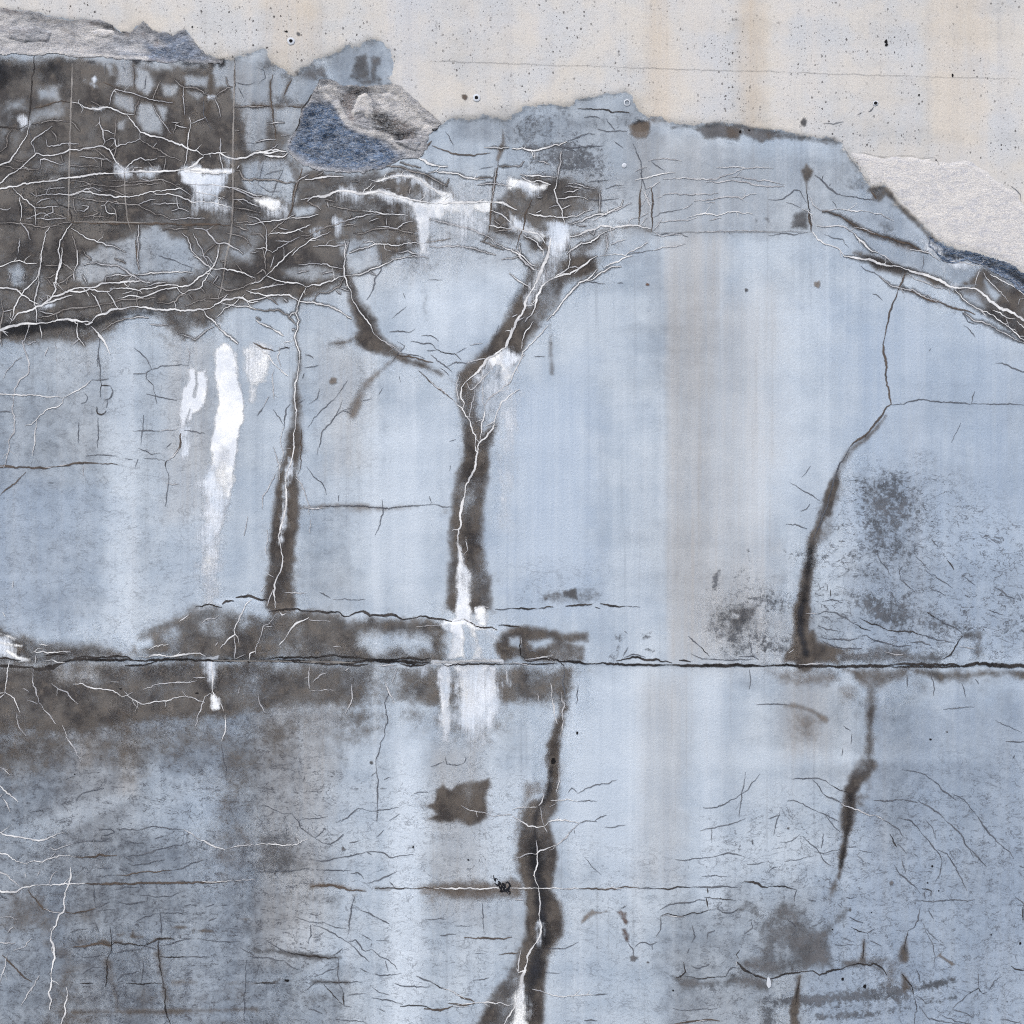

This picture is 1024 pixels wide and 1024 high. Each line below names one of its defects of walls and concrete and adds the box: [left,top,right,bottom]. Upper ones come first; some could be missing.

spalling [0,8,223,64]
spalling [287,79,441,173]
leakage [802,164,813,181]
spalling [851,152,1024,294]
leakage [0,57,604,1024]
crack [0,57,1024,836]
leakage [784,473,842,681]
crack [0,804,517,1024]
crack [462,780,887,1005]
crack [675,772,987,961]
leakage [832,669,1024,893]
crack [902,956,1024,1024]